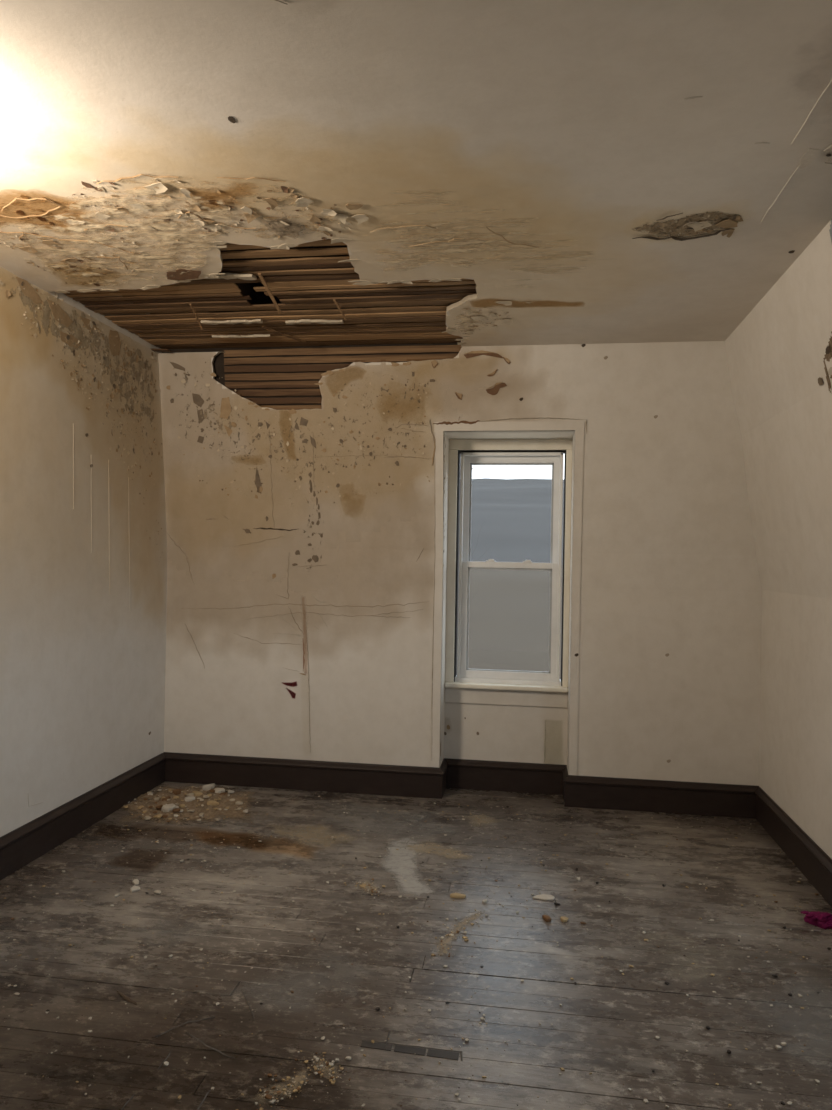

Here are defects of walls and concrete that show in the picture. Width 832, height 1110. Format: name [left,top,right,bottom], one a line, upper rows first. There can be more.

leakage [0,174,588,287]
flaking render [632,212,743,241]
flaking render [0,238,511,504]
flaking render [818,332,832,393]
leakage [292,472,323,568]